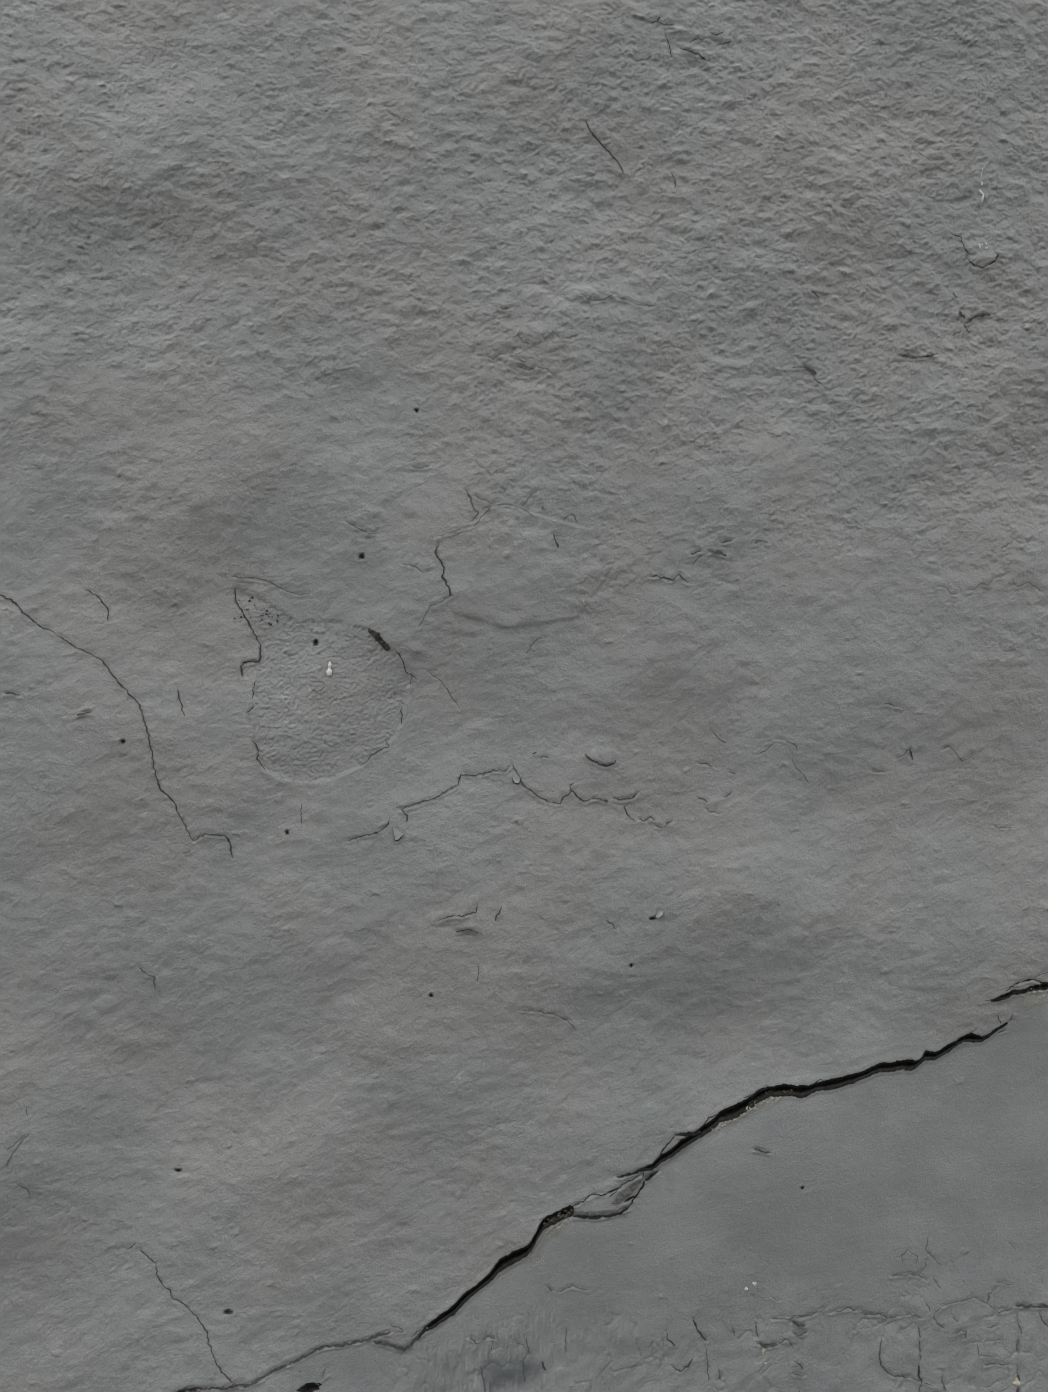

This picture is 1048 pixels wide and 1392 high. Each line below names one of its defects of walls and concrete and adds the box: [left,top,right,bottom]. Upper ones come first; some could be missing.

crack [402,490,577,626]
crack [0,594,233,858]
crack [232,576,309,771]
crack [360,650,457,766]
crack [348,752,672,841]
crack [696,732,809,814]
crack [6,1109,32,1200]
crack [128,972,1048,1392]